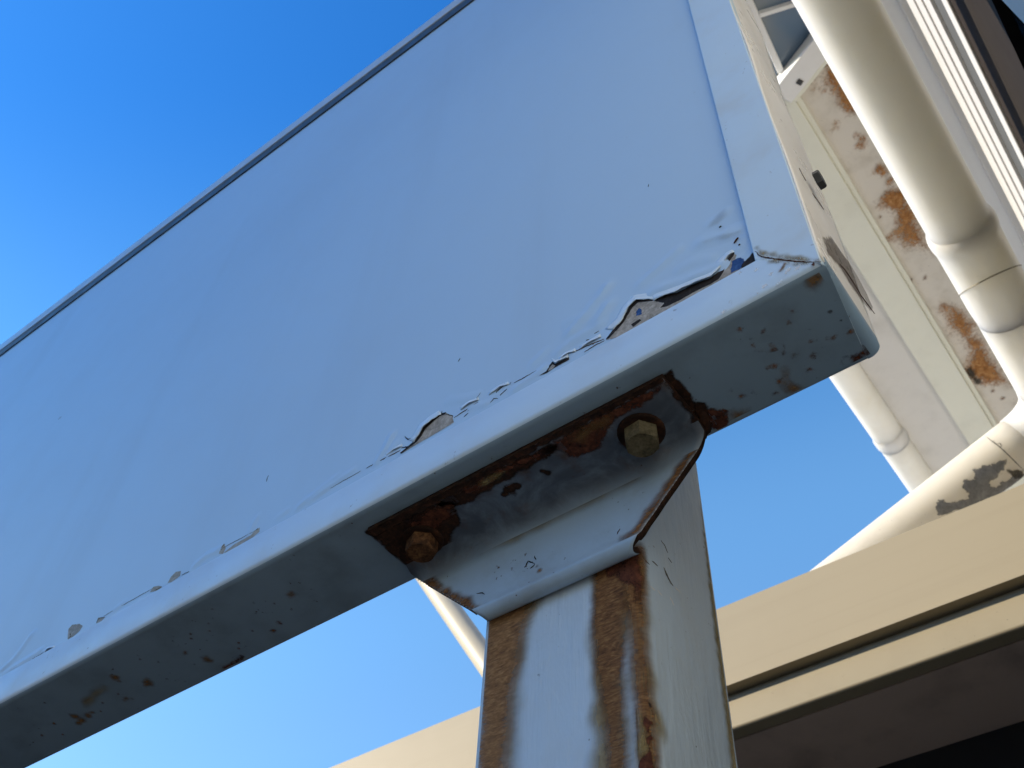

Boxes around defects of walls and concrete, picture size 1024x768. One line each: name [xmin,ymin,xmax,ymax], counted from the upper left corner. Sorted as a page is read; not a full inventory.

rust [814,64,856,113]
rust [875,165,926,248]
peeling [541,250,744,375]
rust [939,304,1006,386]
peeling [385,382,509,456]
rust [365,370,743,565]
peeling [936,460,1024,515]
peeling [67,624,82,639]
peeling [150,571,188,592]
peeling [219,528,260,554]
rust [593,449,697,768]
rust [478,600,537,768]